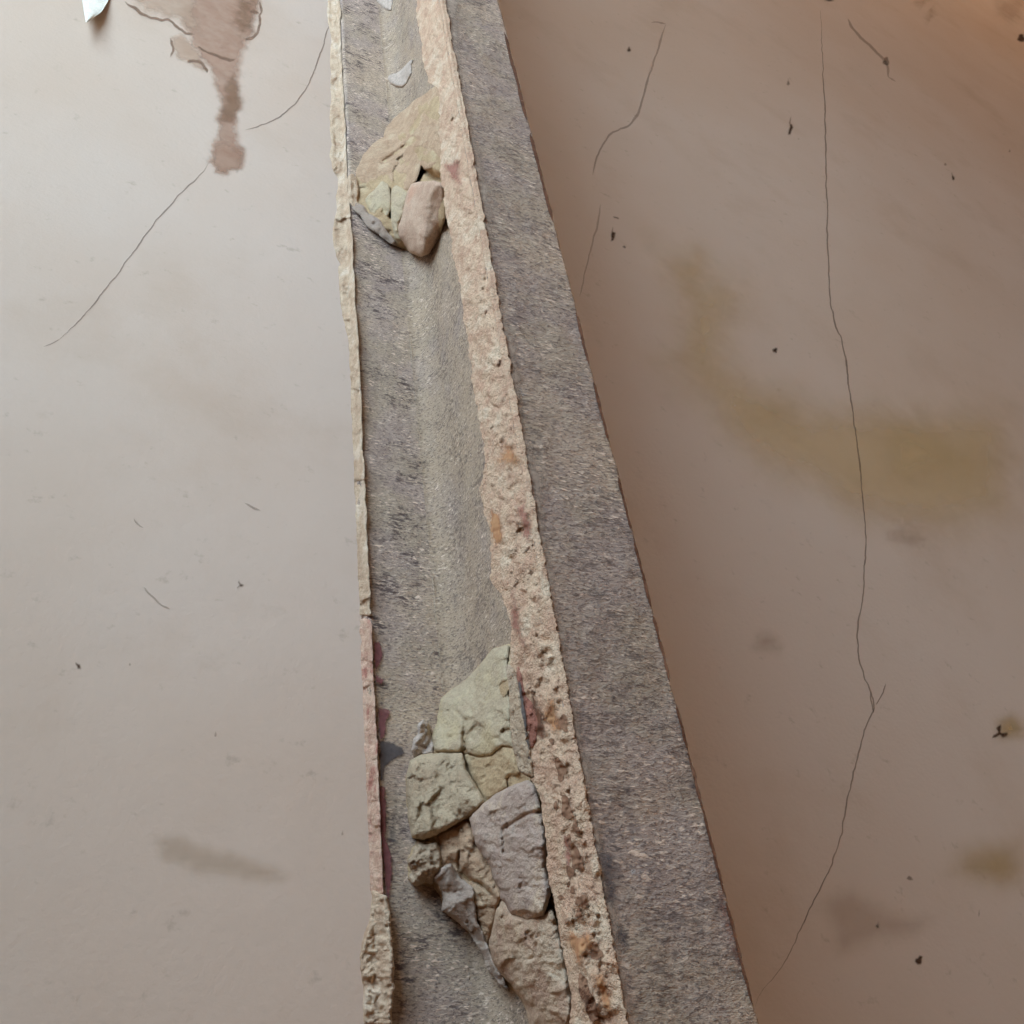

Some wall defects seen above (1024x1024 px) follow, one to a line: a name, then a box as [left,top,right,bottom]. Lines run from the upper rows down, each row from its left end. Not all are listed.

spalling [347,173,407,246]
peeling [359,618,392,898]
spalling [518,682,530,759]
spalling [549,714,568,743]
spalling [555,757,567,781]
spalling [553,795,588,920]
peeling [434,863,508,988]
spalling [591,942,603,960]
spalling [578,972,600,1022]